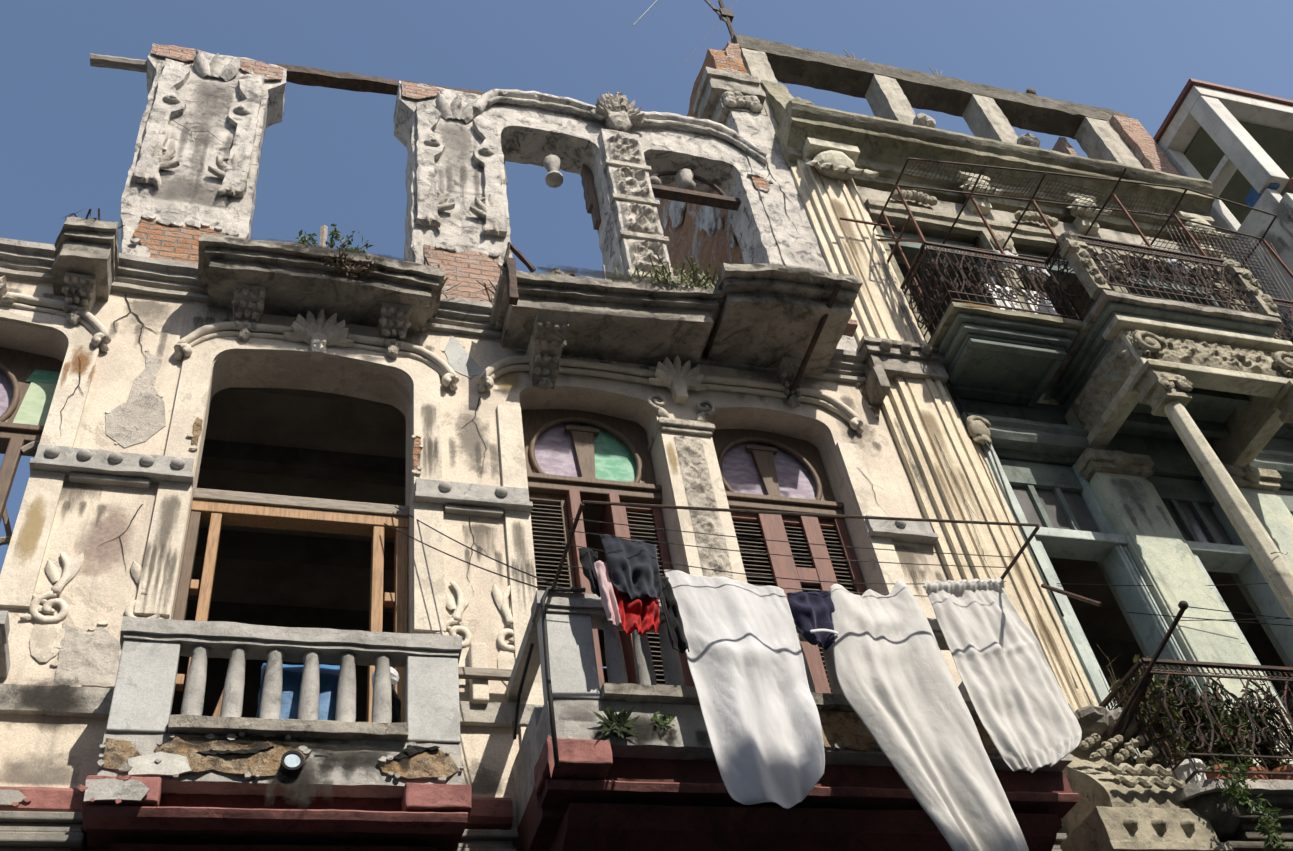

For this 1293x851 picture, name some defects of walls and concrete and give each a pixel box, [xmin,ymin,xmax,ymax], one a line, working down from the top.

peeling [663,187,686,229]
peeling [698,205,738,248]
crack [113,295,156,357]
peeling [105,349,166,448]
spalling [411,434,423,475]
crack [462,397,487,475]
crack [99,504,143,566]
leakage [896,546,941,587]
leakage [1038,619,1065,684]
spalling [97,732,311,780]
spalling [377,742,464,783]